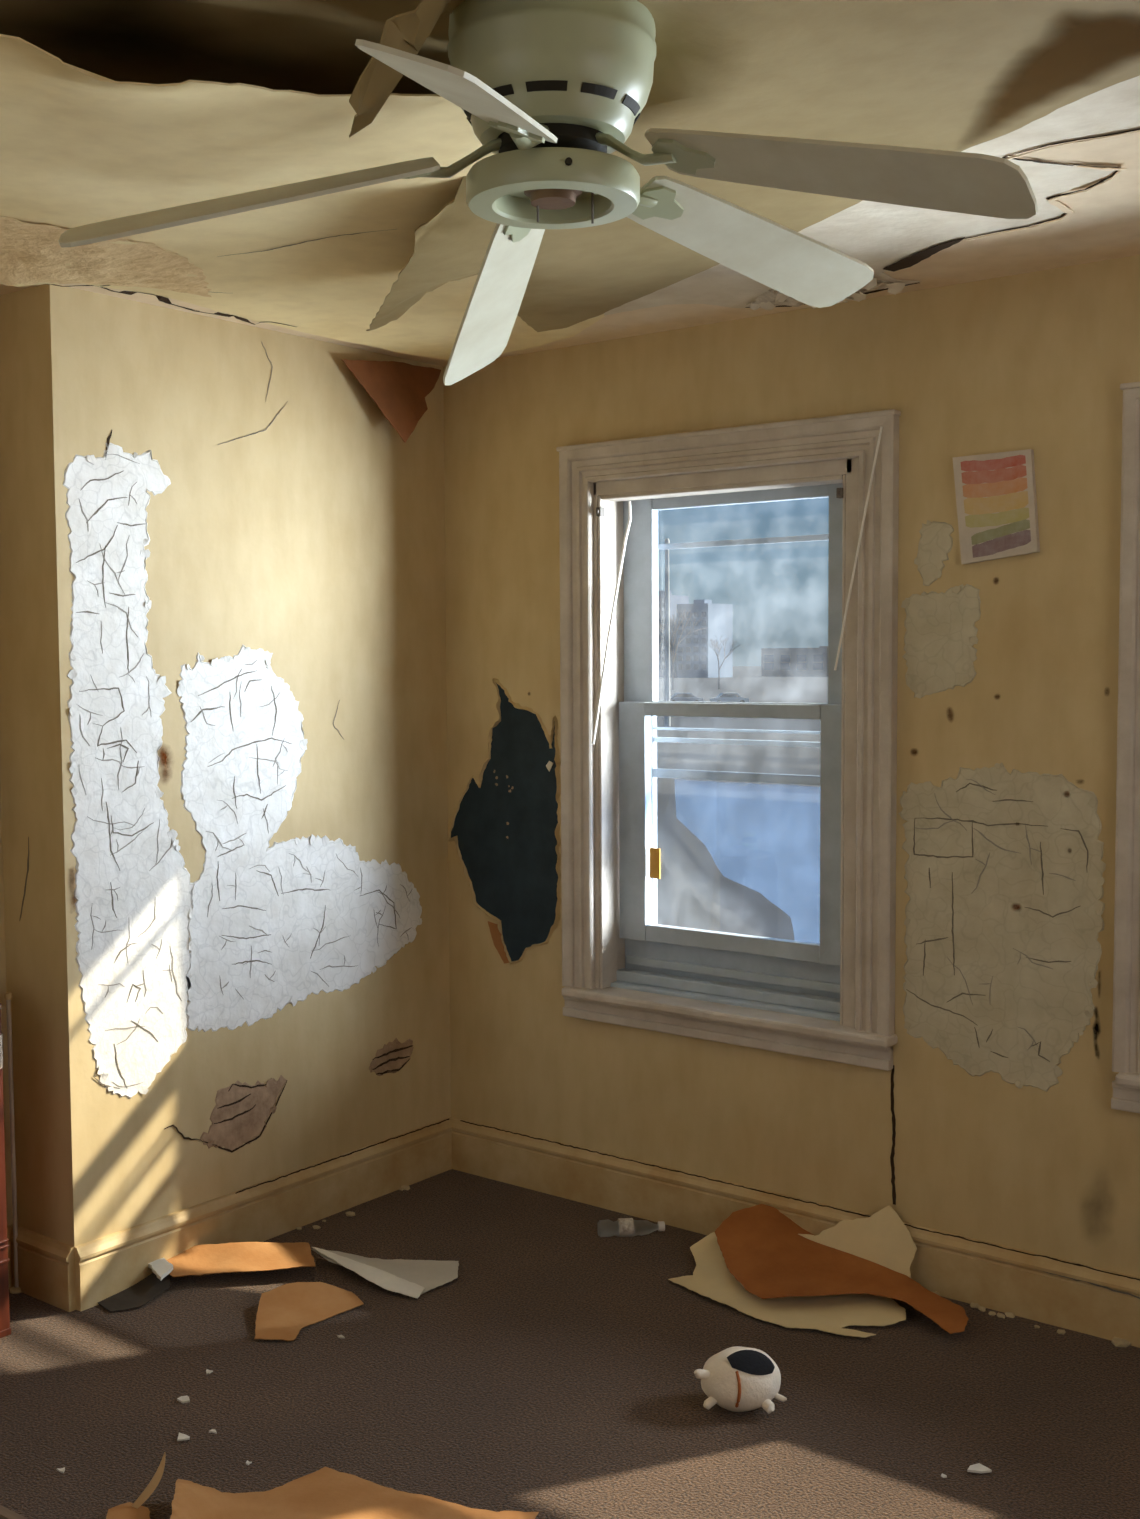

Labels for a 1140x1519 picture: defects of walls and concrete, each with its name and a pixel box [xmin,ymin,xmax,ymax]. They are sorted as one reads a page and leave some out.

peeling [342,359,441,443]
flaking render [604,264,816,315]
flaking render [798,76,1140,303]
damp [980,17,1140,135]
peeling [901,520,981,699]
peeling [63,443,422,1099]
spalling [448,678,562,964]
peeling [899,762,1106,1092]
flaking render [164,1075,287,1153]
crack [235,1065,1140,1299]